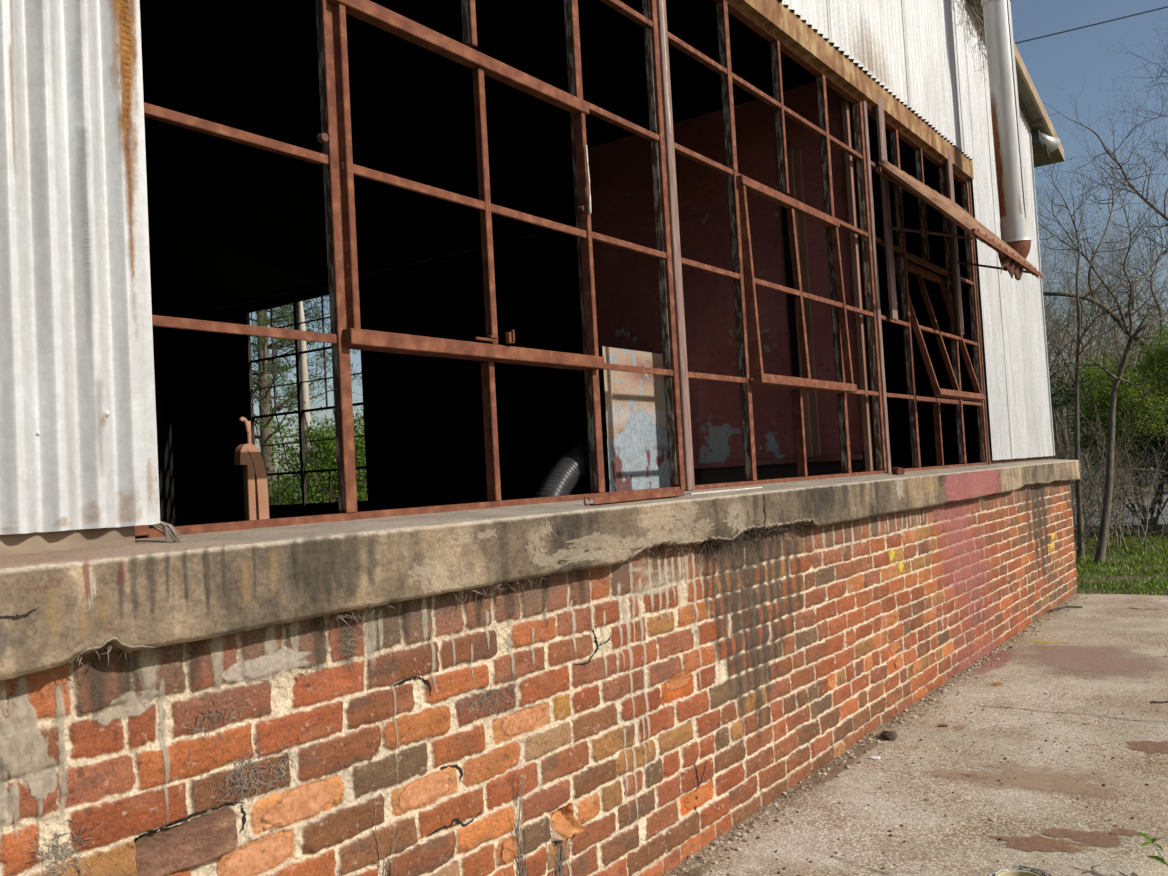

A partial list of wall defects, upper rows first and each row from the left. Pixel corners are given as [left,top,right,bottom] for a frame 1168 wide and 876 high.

rust [113,0,137,219]
crack [0,607,39,620]
crack [573,630,612,665]
crack [393,676,432,696]
crack [441,765,463,782]
crack [135,801,246,843]
crack [429,809,482,836]
spalling [550,809,579,837]